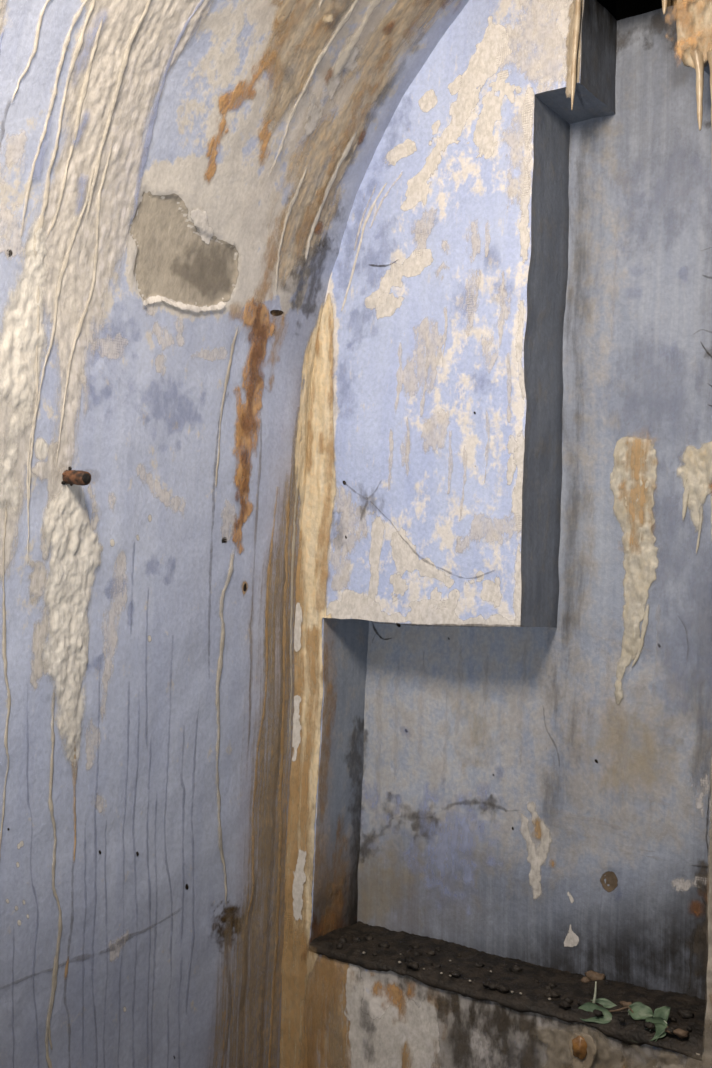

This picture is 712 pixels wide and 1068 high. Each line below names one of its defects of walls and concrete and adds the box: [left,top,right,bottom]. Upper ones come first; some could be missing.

spalling [130,191,239,374]
rust [205,0,354,181]
rust [231,0,446,554]
peeling [365,0,571,334]
peeling [481,286,526,397]
water stain [565,0,583,97]
peeling [326,433,524,627]
peeling [86,539,127,770]
water stain [213,423,538,1068]
water stain [672,764,712,1068]